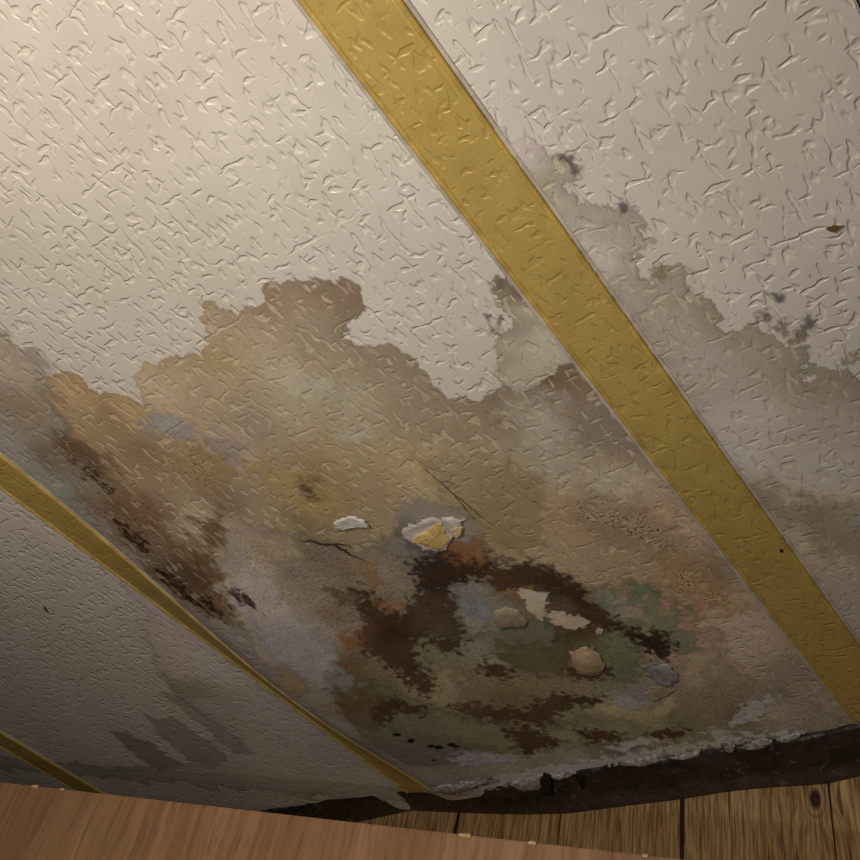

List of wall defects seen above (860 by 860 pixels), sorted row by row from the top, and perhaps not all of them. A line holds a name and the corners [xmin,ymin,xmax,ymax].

crack [305,540,365,561]
water stain [0,271,851,802]
flaking render [213,516,841,795]
water stain [494,126,860,644]